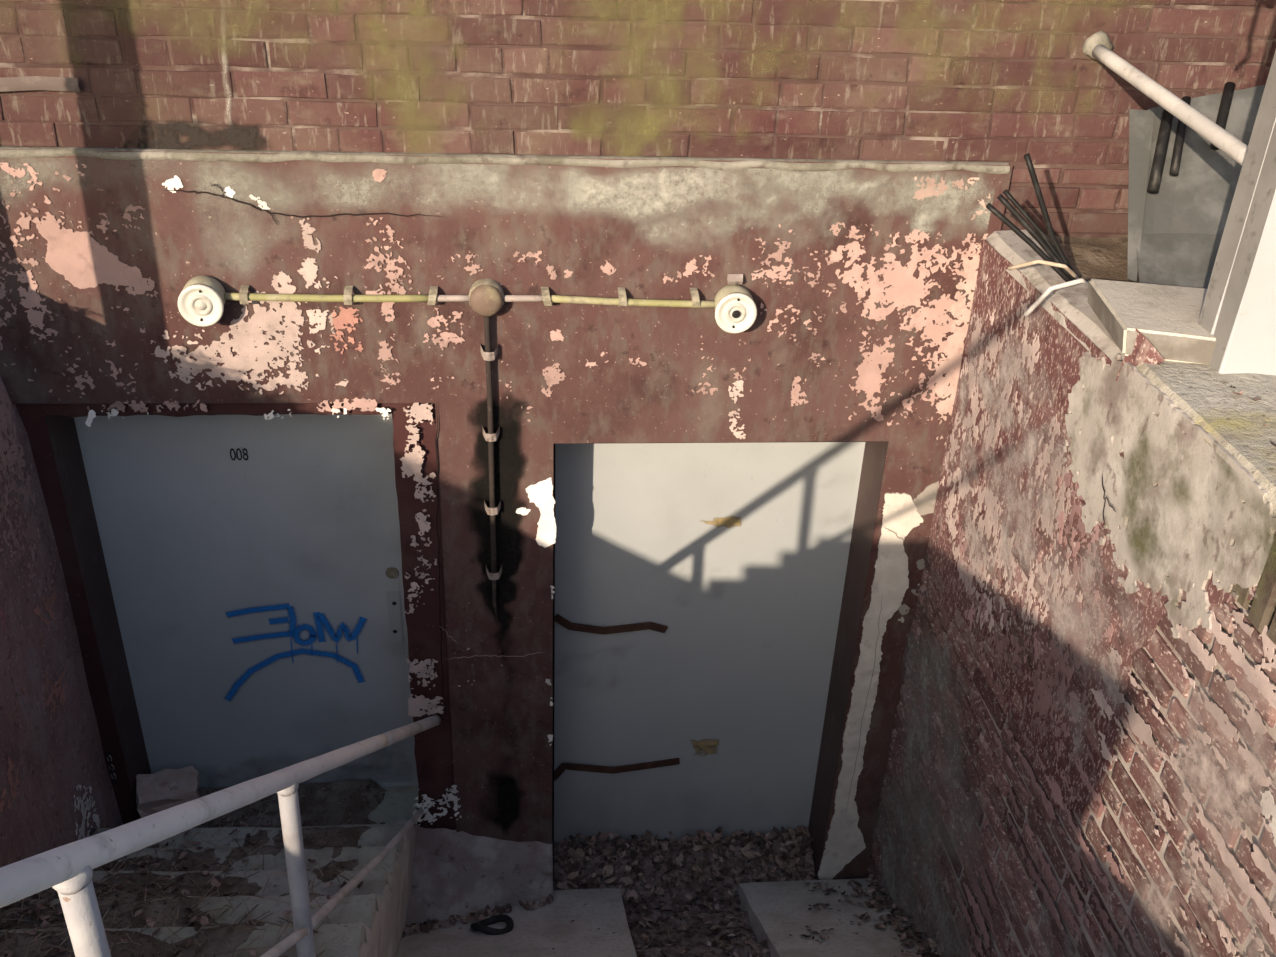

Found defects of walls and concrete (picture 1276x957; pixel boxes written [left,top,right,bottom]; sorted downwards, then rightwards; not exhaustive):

peeling [162,175,183,193]
peeling [223,187,271,210]
crack [164,184,441,224]
peeling [913,177,980,201]
peeling [0,162,159,366]
peeling [451,254,483,275]
peeling [60,217,422,427]
peeling [423,307,465,356]
peeling [691,335,752,439]
peeling [316,379,437,614]
damp [470,401,525,643]
flaking render [751,194,1276,957]